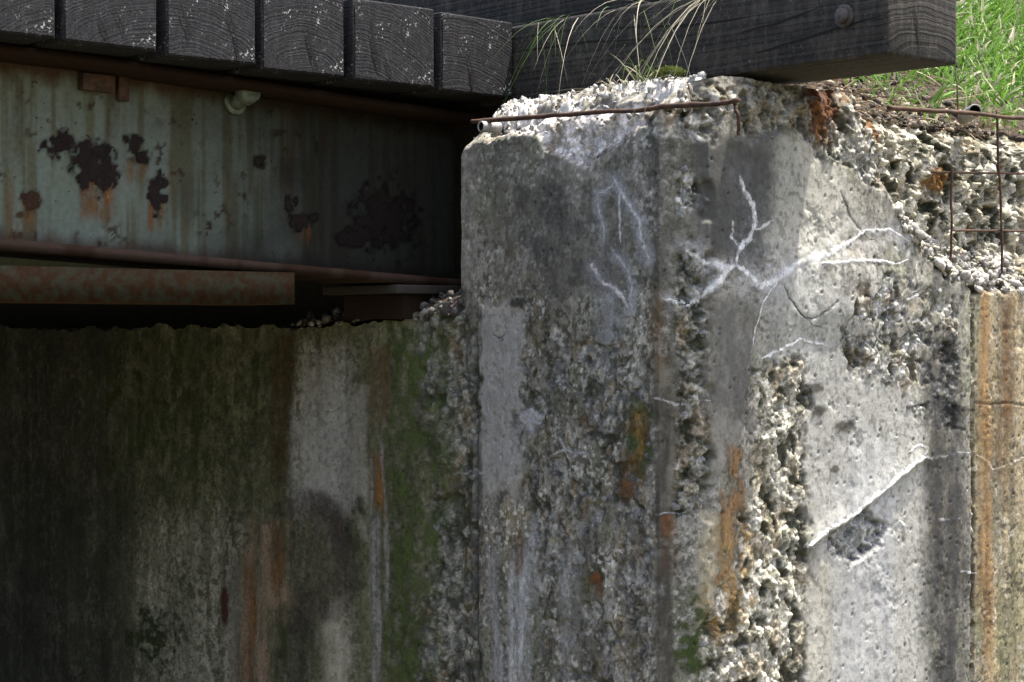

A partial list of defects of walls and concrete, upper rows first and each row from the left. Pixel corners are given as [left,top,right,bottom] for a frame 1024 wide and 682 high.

corrosion [801,88,847,144]
crack [588,175,909,359]
spalling [487,82,1024,432]
crack [886,290,925,310]
corrosion [708,445,752,643]
spalling [699,356,883,682]
crack [807,444,1024,549]